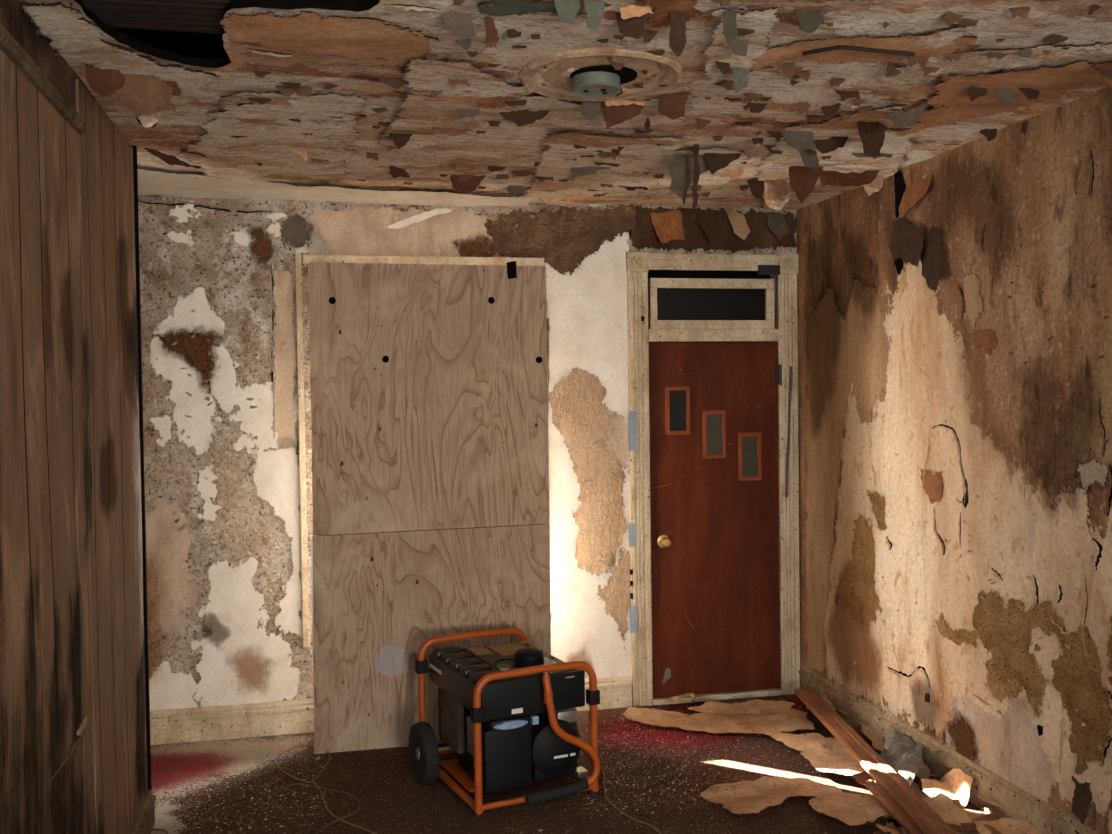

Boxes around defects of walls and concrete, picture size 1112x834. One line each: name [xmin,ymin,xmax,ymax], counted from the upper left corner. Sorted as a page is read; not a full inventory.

peeling [22,1,220,128]
peeling [137,0,948,255]
peeling [885,11,1112,88]
peeling [967,87,1040,142]
peeling [1009,7,1031,18]
damp [963,335,1019,461]
damp [1023,359,1093,505]
flaking render [144,287,310,711]
flaking render [824,260,1112,819]
damp [0,569,103,834]
damp [912,685,936,730]